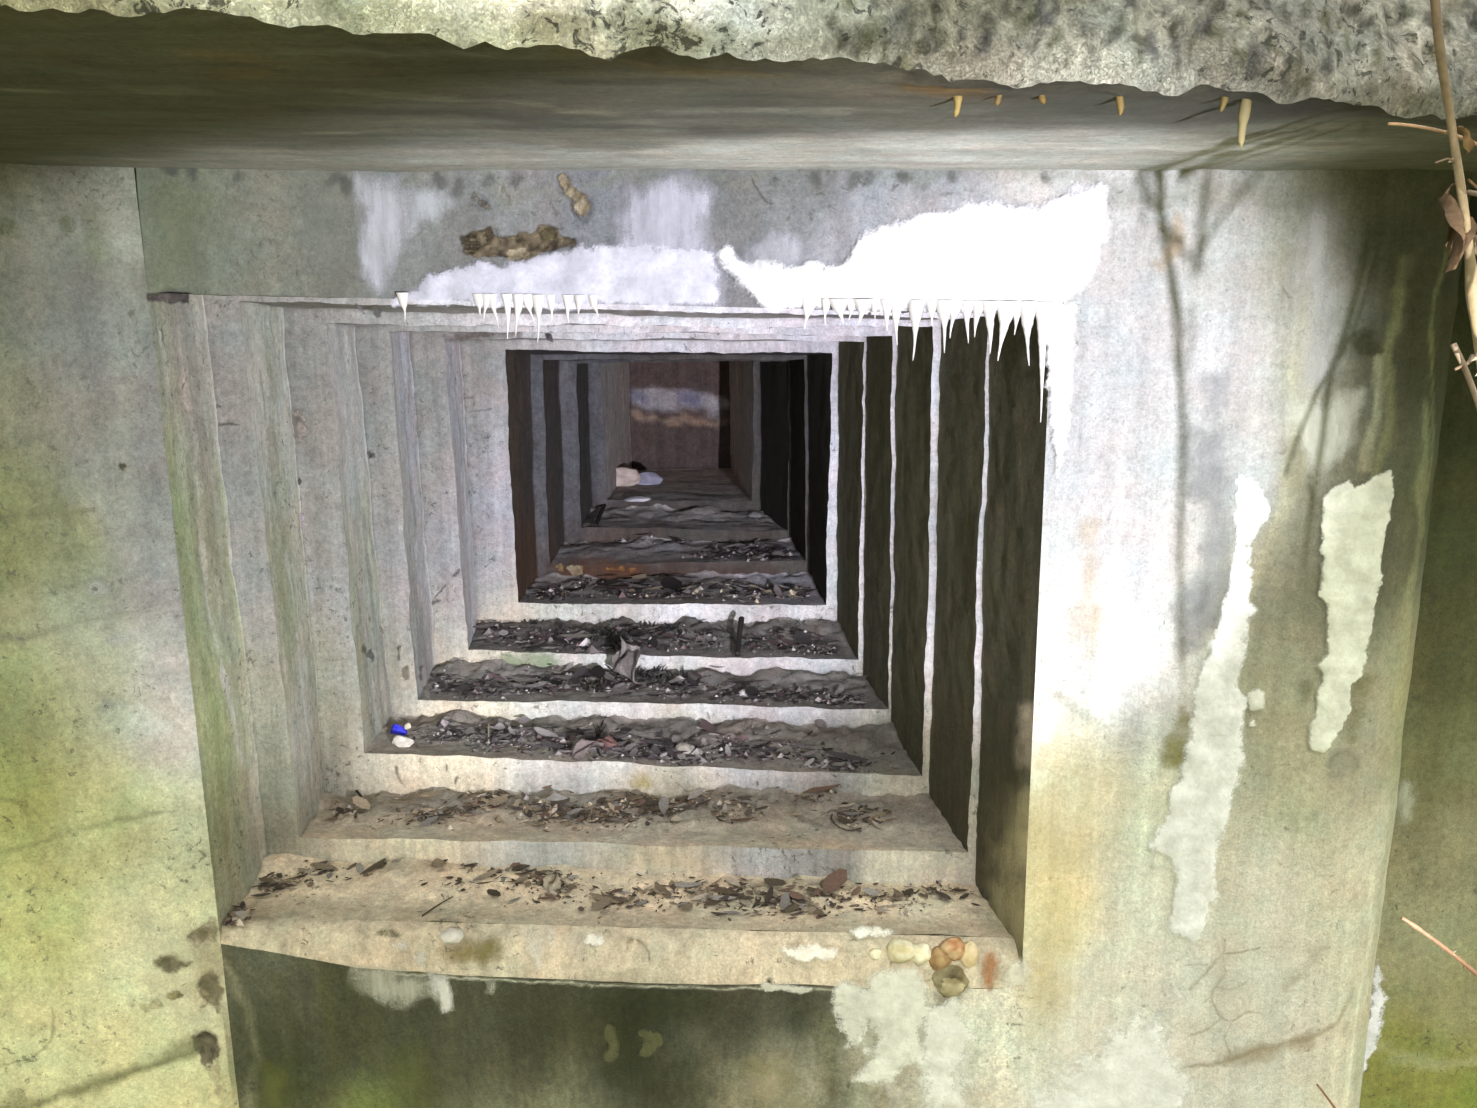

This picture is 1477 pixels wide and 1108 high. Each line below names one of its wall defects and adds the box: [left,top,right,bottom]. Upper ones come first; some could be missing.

water stain [334,176,1109,475]
peeling [1309,470,1394,754]
water stain [363,968,974,1108]
water stain [1004,961,1029,992]
water stain [1031,1016,1193,1108]